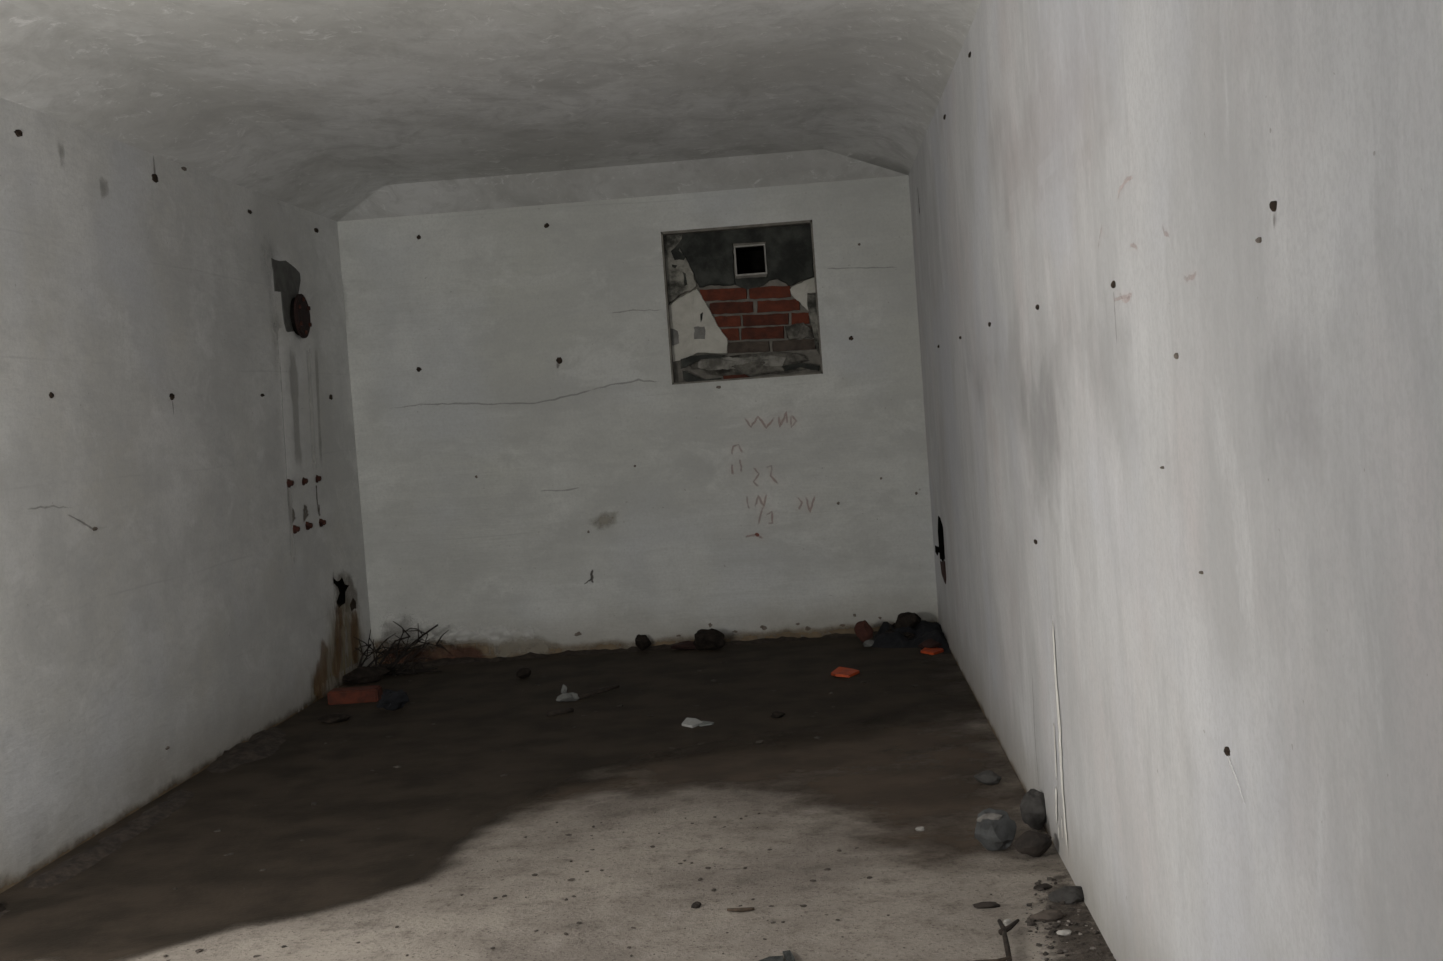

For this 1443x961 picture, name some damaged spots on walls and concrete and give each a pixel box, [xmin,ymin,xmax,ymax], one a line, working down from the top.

flaking render [664,224,819,382]
corrosion [312,610,362,704]